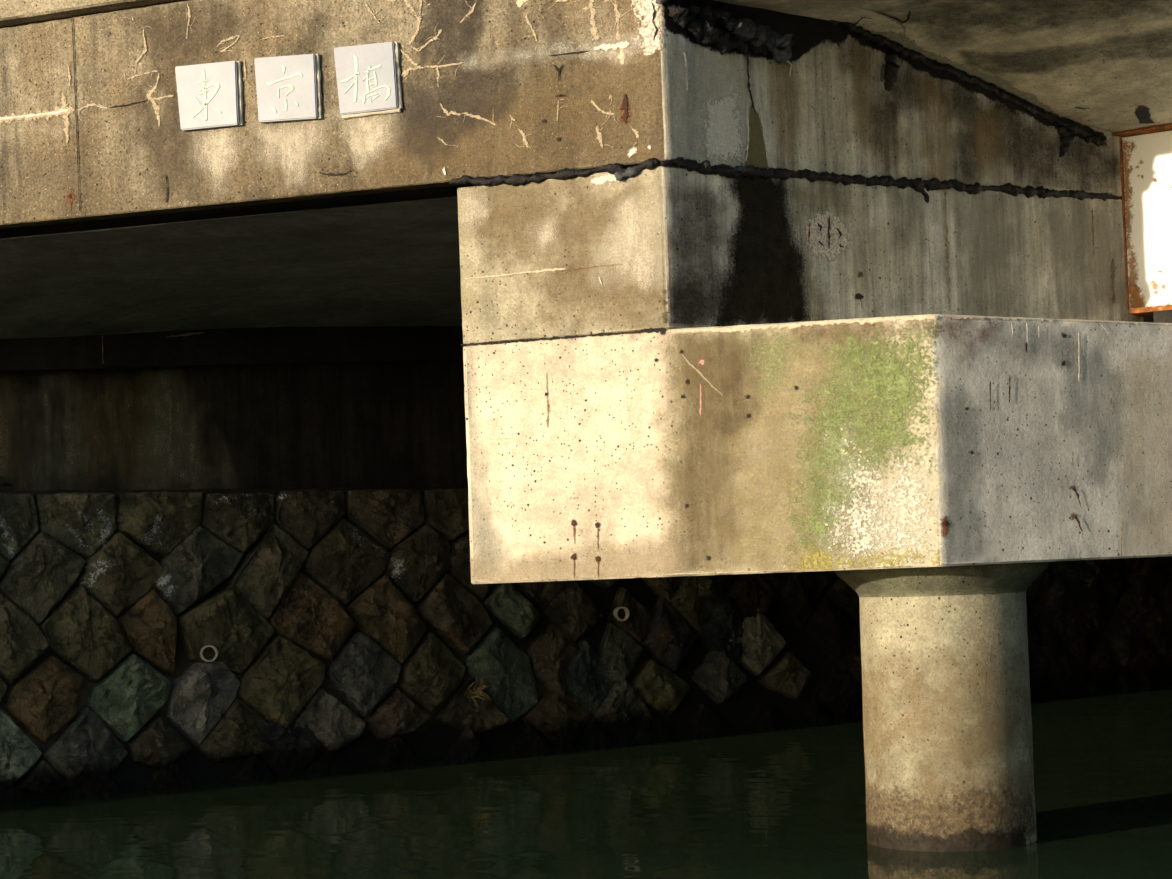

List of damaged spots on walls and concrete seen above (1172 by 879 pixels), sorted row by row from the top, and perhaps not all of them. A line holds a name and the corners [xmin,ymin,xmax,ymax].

crack [71,15,174,211]
crack [364,0,639,151]
spalling [631,0,666,56]
crack [745,54,768,168]
corrosion [1122,141,1169,309]
leakage [462,48,980,581]
leakage [866,784,1035,852]